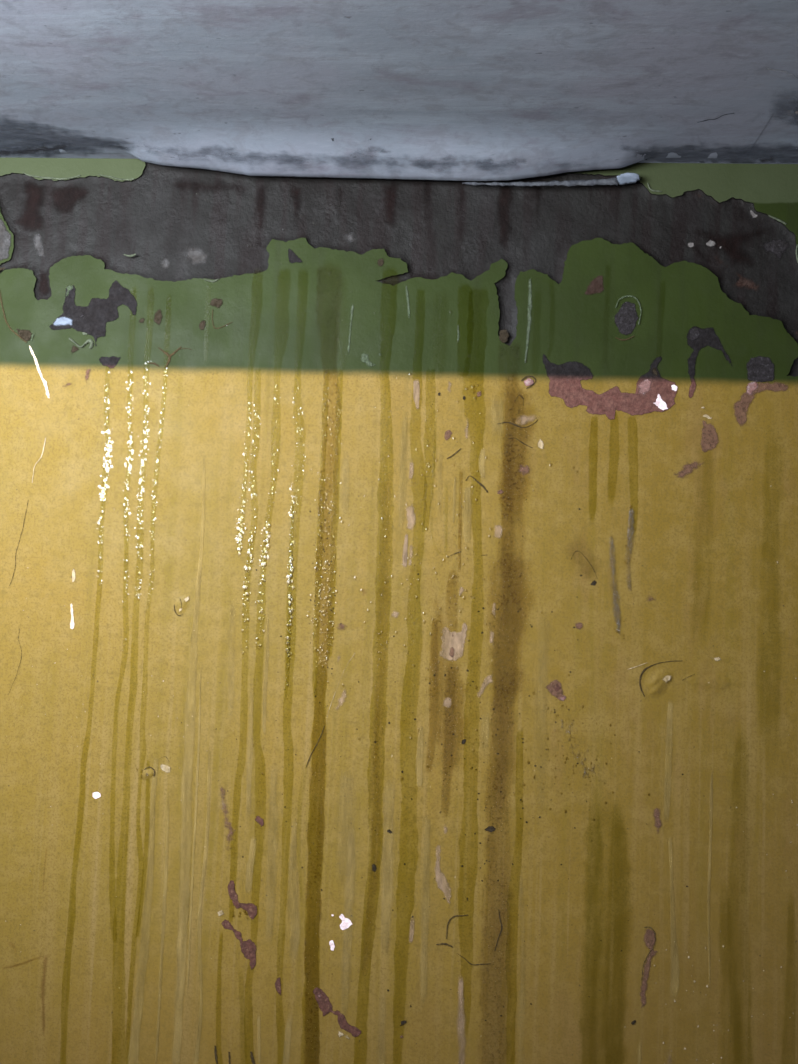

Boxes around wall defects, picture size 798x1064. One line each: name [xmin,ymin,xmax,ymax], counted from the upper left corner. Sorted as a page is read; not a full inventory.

water stain [0,120,126,156]
water stain [279,155,302,164]
water stain [476,160,509,170]
water stain [639,145,798,164]
flaking render [0,162,798,379]
flaking render [498,326,732,452]
peeling [734,356,798,425]
peeling [406,506,415,529]